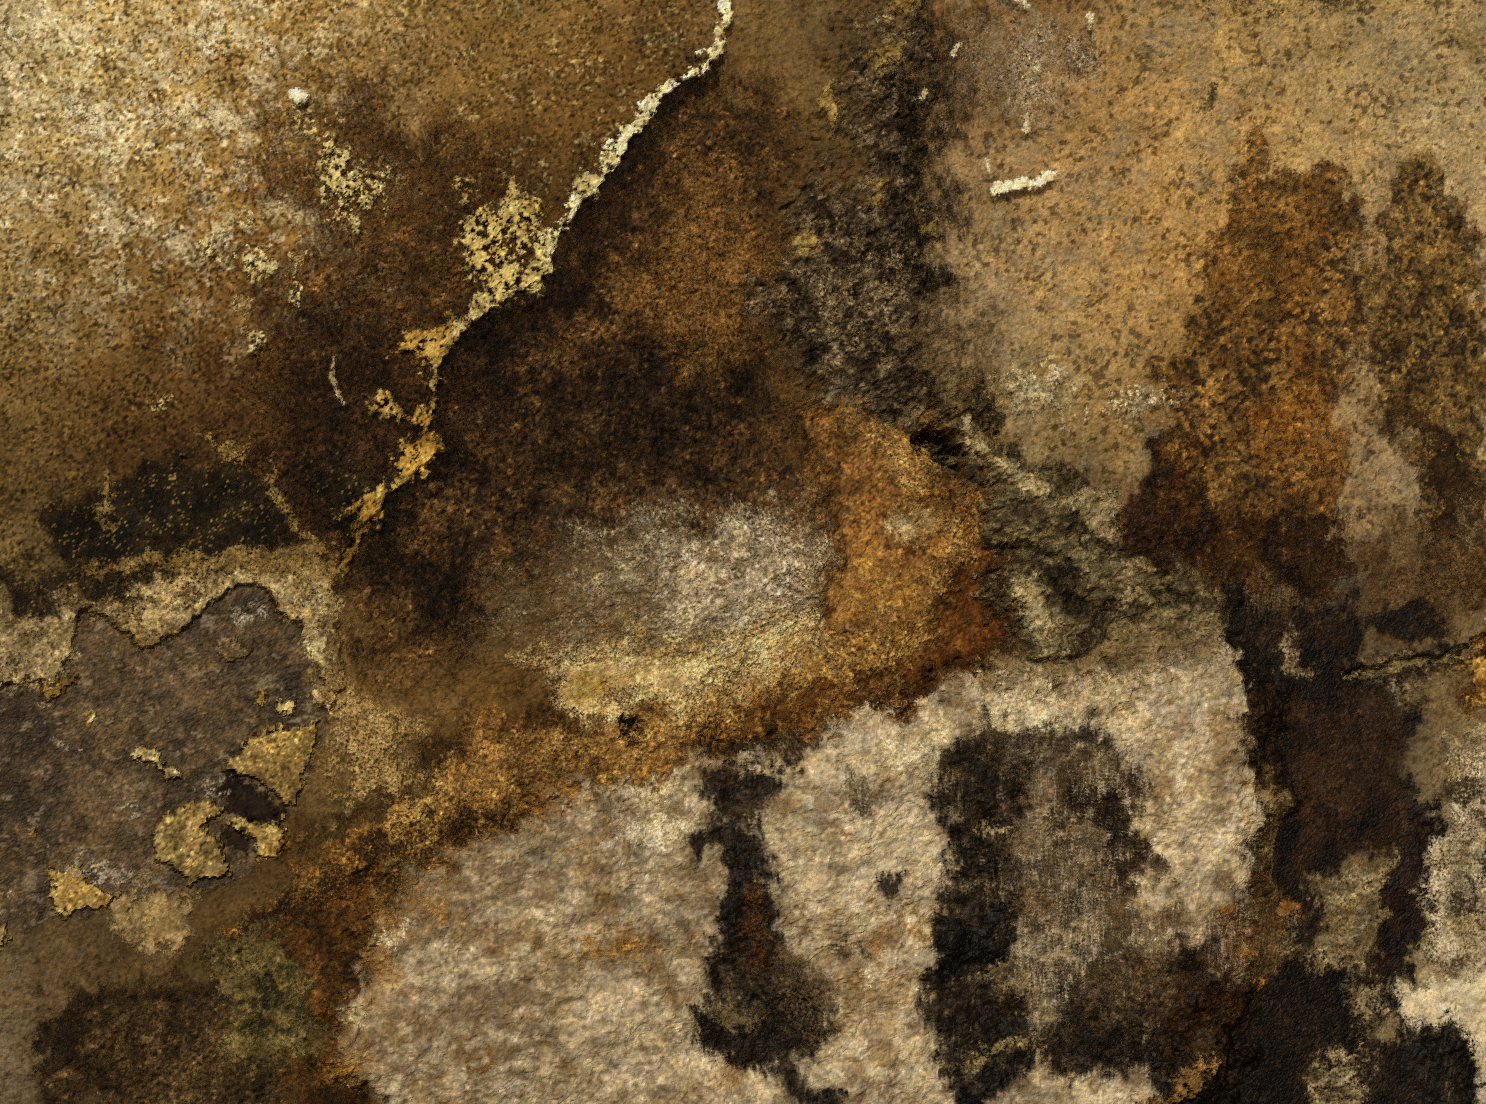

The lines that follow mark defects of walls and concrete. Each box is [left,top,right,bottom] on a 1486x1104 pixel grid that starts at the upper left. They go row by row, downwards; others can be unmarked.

crack [335,0,733,580]
water stain [0,0,1098,830]
water stain [1062,379,1182,428]
peeling [0,545,345,957]
water stain [684,761,848,1104]
water stain [829,929,872,956]
water stain [913,501,1486,1104]
crack [1341,649,1486,681]